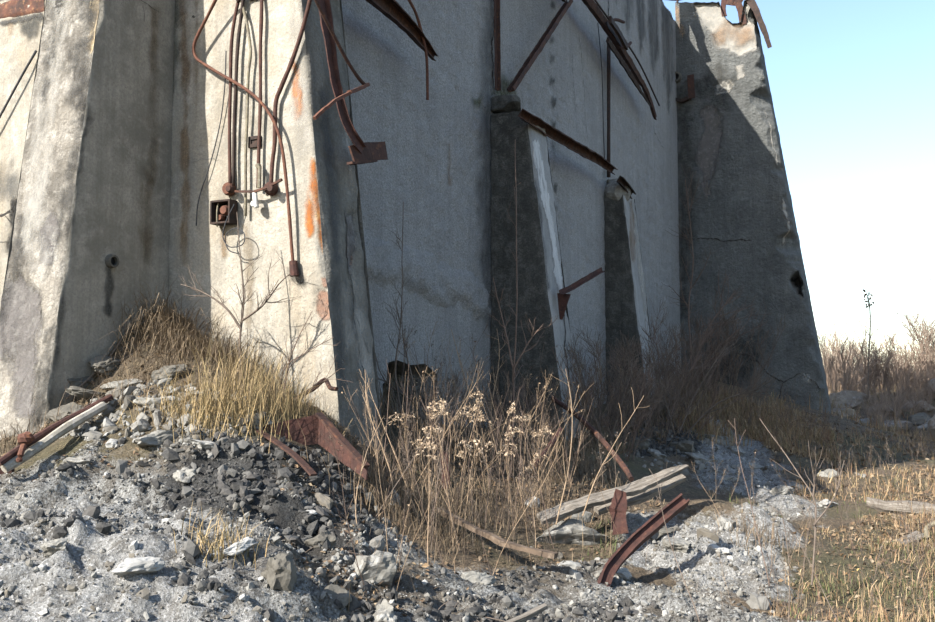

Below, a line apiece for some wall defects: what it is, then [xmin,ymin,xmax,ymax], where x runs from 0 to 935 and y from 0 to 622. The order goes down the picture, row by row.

rust [293,62,303,116]
spalling [694,2,757,94]
rust [305,160,323,250]
water stain [105,268,114,316]